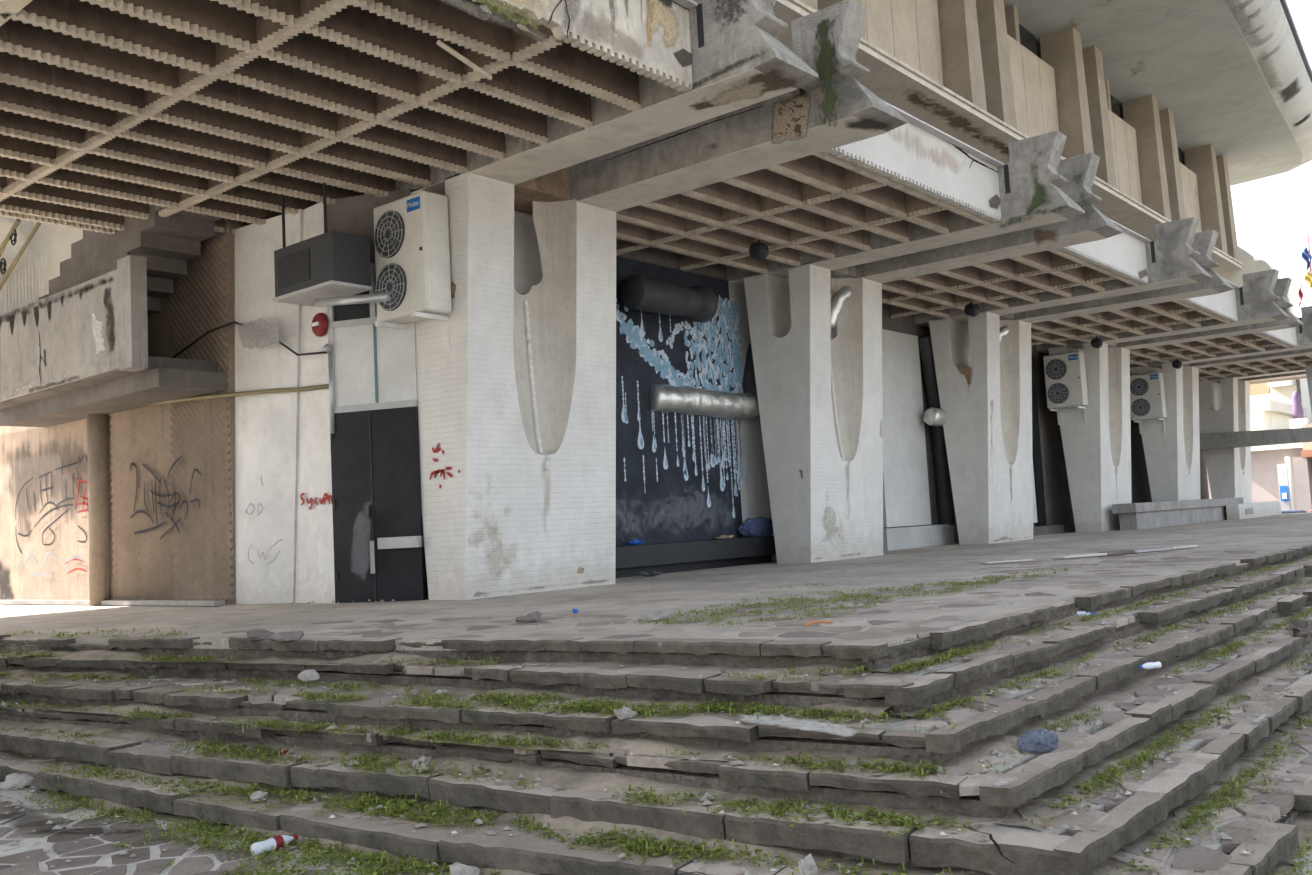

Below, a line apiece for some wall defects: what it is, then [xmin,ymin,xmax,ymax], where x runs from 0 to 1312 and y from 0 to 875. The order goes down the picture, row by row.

crack [548,0,570,38]
damp [715,0,747,25]
damp [1281,79,1300,102]
spalling [772,95,810,143]